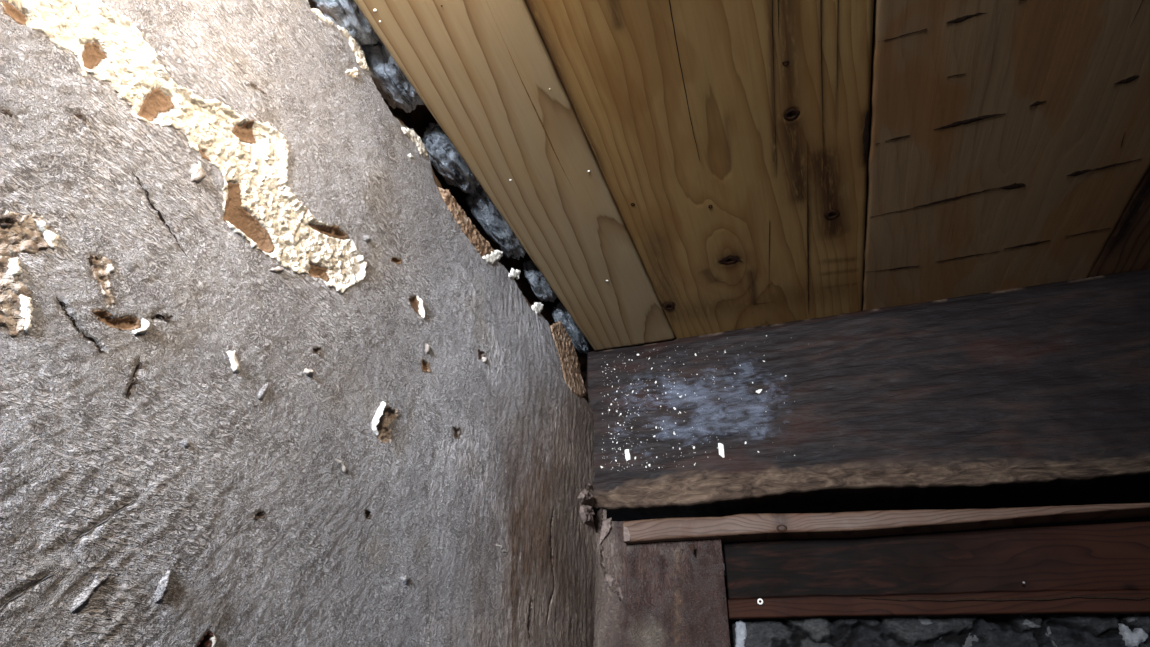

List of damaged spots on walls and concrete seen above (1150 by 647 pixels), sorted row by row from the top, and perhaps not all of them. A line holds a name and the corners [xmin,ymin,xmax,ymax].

spalling [0,0,370,294]
spalling [0,210,61,337]
spalling [87,254,173,335]
spalling [372,402,399,443]